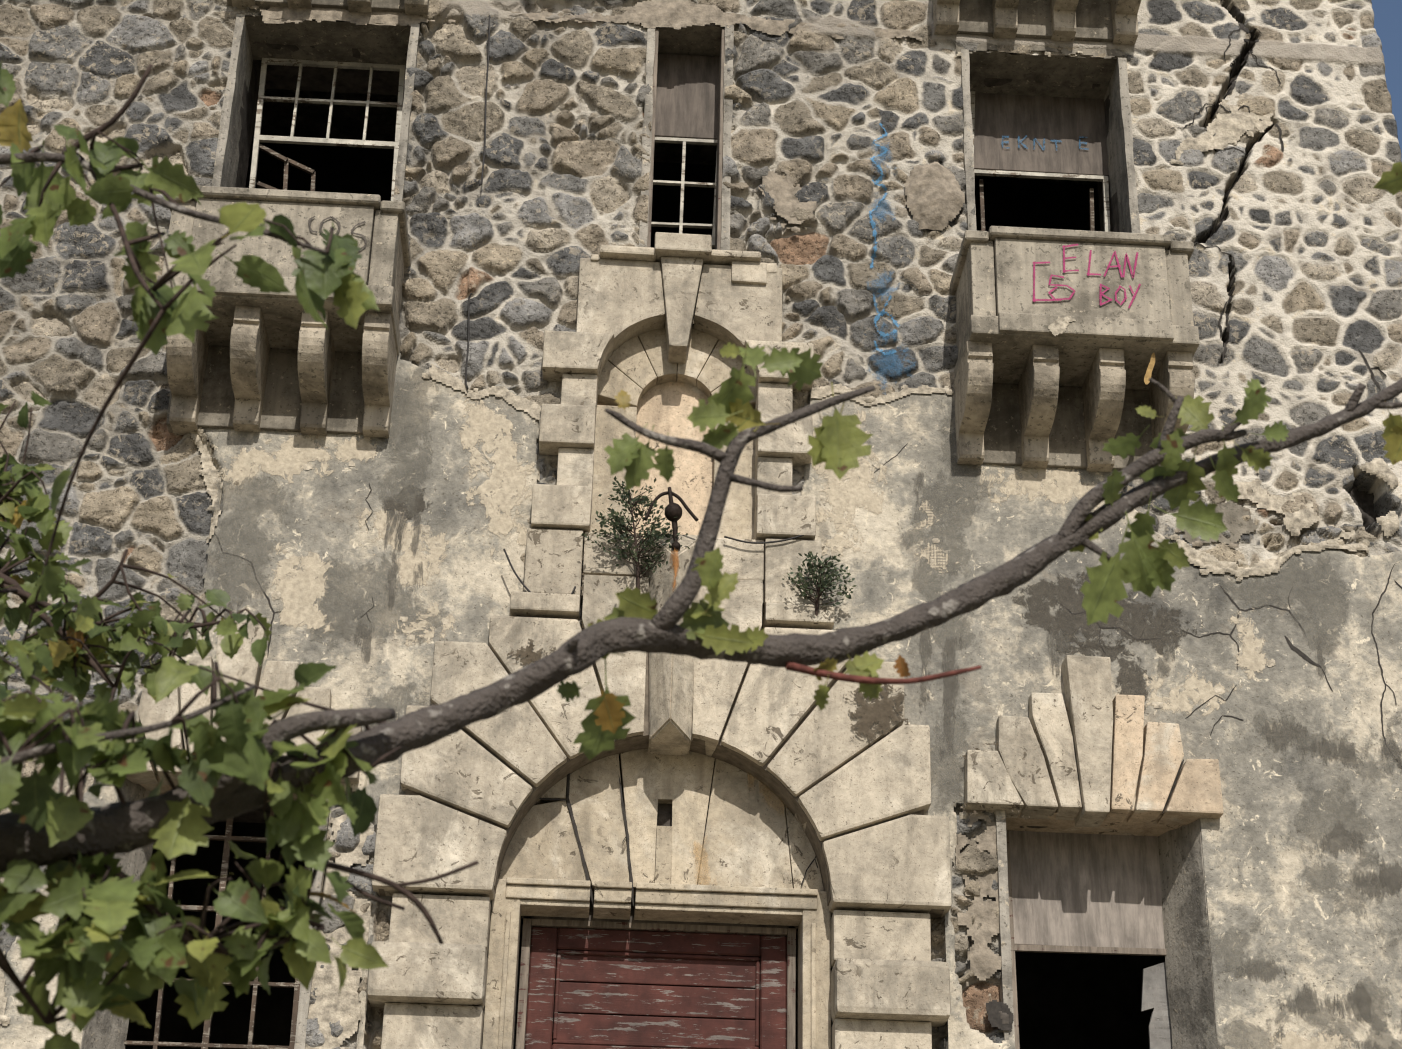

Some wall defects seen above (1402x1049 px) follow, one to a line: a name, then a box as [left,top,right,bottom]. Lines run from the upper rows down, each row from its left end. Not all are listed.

crack [1170,0,1284,361]
leakage [382,485,432,608]
flaking render [1169,470,1399,581]
peeling [1360,458,1399,489]
leakage [355,624,371,662]
leakage [1012,572,1203,710]
crack [1058,586,1333,735]
crack [1371,564,1402,768]
crack [539,773,593,904]
crack [619,777,634,906]
crack [1162,759,1184,814]
flaking render [955,806,1009,1024]